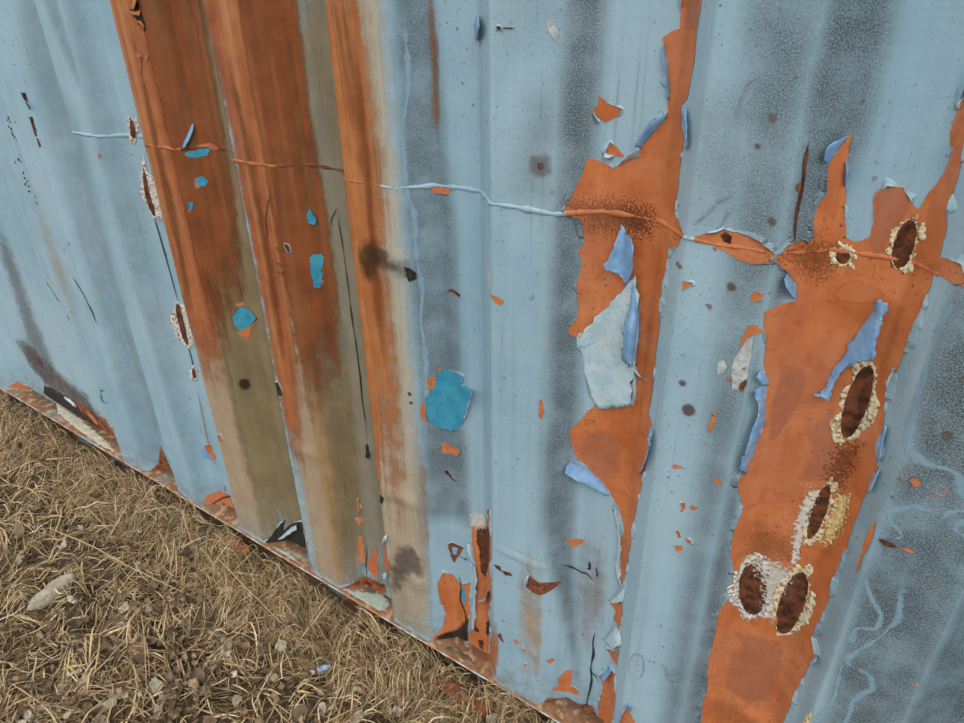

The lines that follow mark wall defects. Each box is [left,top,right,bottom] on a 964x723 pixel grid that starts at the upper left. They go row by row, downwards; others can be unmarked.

peeling [182,123,218,158]
rust [828,241,857,269]
rust [885,215,926,274]
rust [110,0,427,616]
peeling [557,0,964,723]
rust [44,386,114,437]
peeling [407,367,472,432]
peeling [440,442,460,457]
rust [801,360,880,546]
peeling [431,508,529,667]
rust [727,552,816,637]
peeling [550,670,580,696]